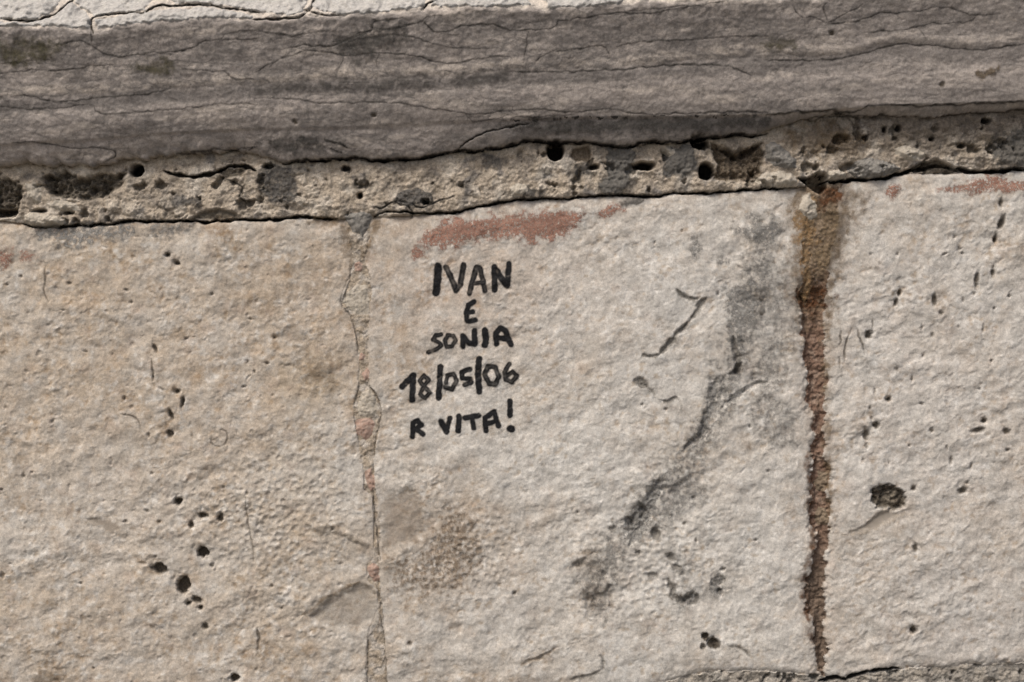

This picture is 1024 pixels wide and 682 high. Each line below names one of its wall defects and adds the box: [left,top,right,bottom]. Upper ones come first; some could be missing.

crack [284,101,1023,165]
crack [25,149,337,229]
crack [374,187,791,217]
crack [817,171,914,186]
crack [956,166,1024,174]
rust [788,187,843,309]
crack [643,289,706,358]
water stain [585,213,785,612]